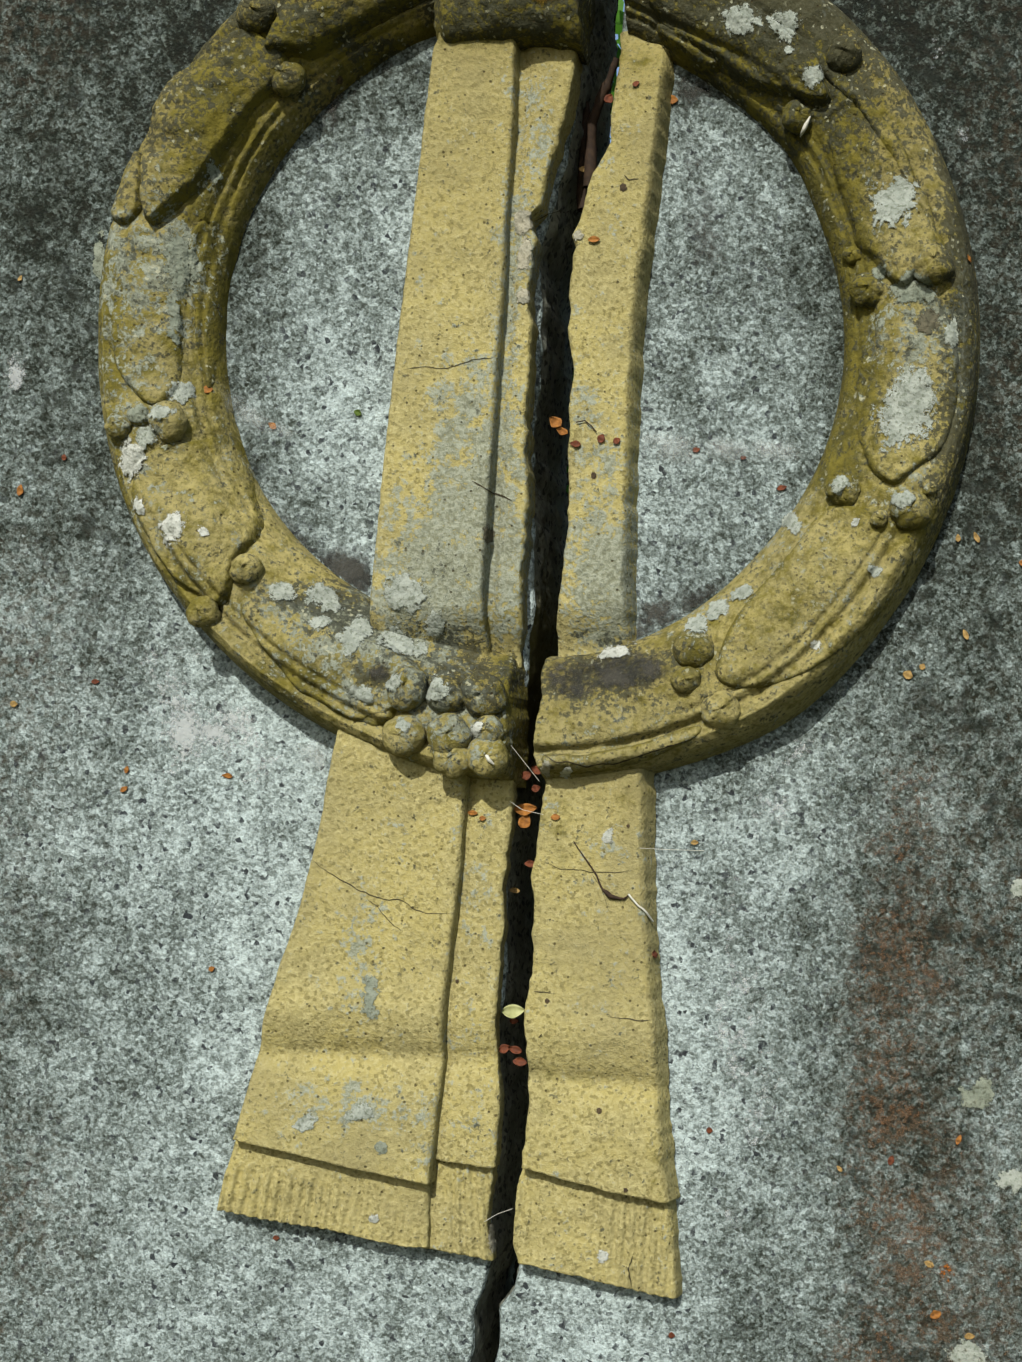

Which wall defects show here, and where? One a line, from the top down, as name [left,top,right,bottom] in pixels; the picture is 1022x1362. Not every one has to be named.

crack [408,357,493,369]
crack [471,0,688,1362]
corrosion [824,749,1019,1362]